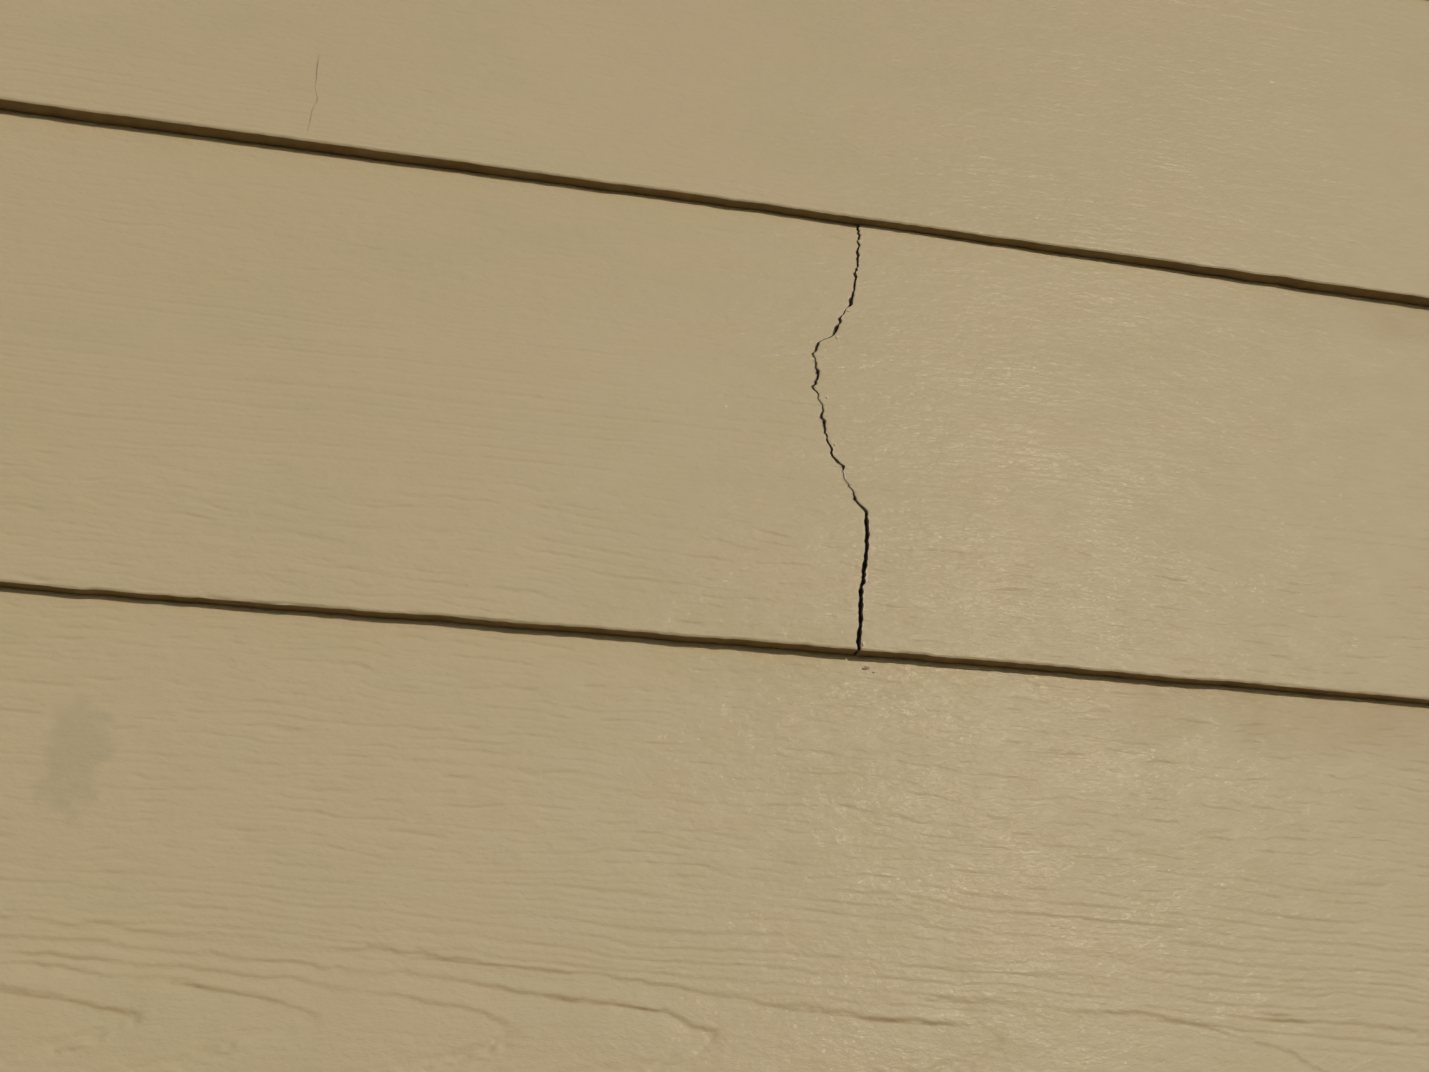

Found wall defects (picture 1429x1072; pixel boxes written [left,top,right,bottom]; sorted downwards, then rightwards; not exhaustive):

crack [811,226,875,673]